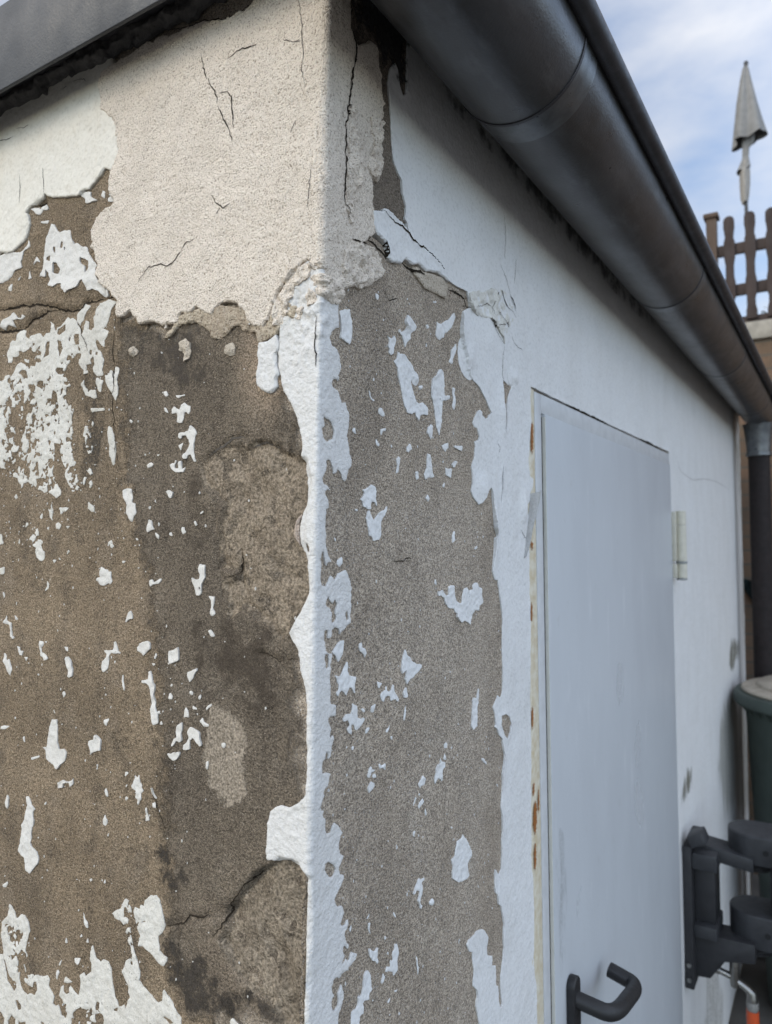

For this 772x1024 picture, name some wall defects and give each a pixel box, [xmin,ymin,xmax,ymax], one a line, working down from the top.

crack [171,1,253,30]
crack [283,0,305,87]
crack [201,44,256,139]
crack [344,7,521,379]
damp [127,327,204,385]
peeling [0,0,515,1024]
mould [156,844,188,891]
crack [168,869,267,936]
damp [162,928,277,1024]